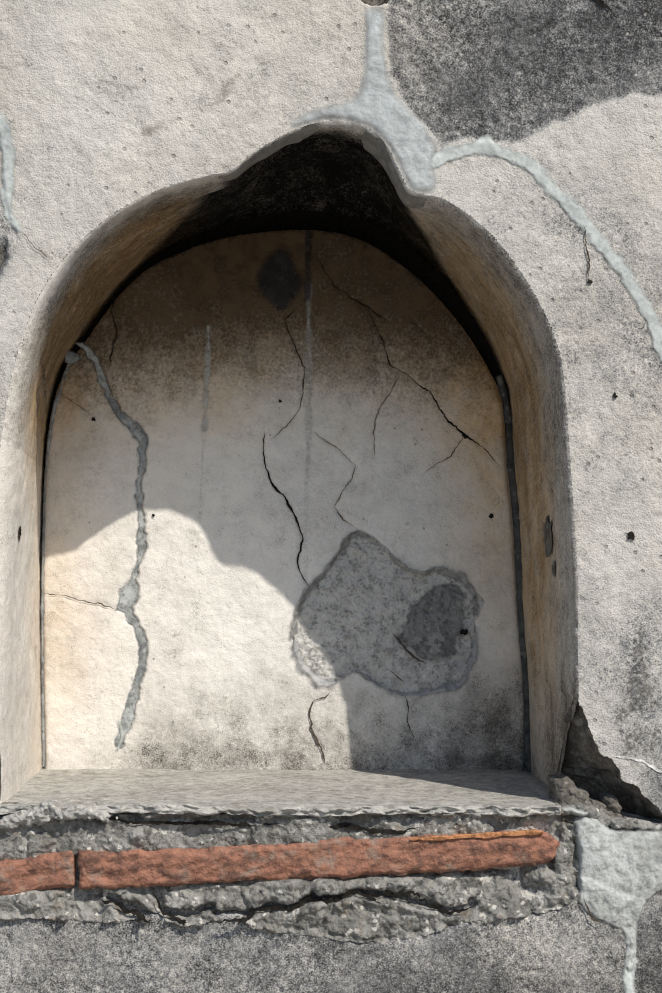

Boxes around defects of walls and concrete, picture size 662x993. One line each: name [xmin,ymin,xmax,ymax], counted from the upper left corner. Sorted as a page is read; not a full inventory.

crack [40,295,148,749]
crack [263,309,309,586]
crack [314,261,497,529]
flaking render [291,530,483,699]
crack [308,692,330,764]
peeling [410,830,544,841]
flaking render [546,697,662,832]